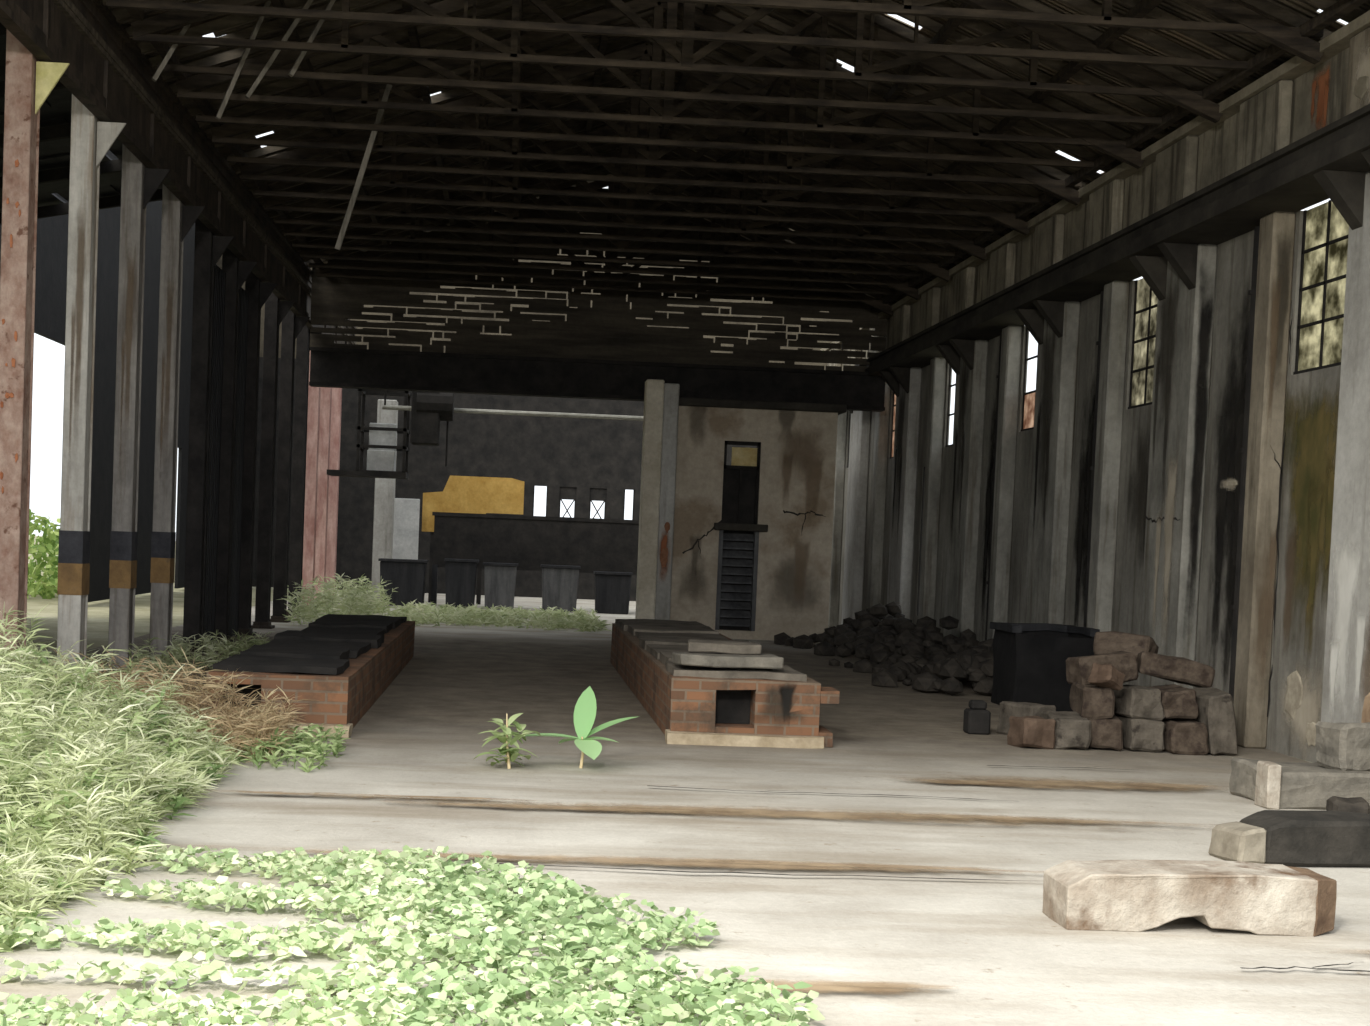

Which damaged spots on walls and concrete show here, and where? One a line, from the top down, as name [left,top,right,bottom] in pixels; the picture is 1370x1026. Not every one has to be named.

damp [1134,292,1177,623]
damp [1191,392,1245,634]
damp [1258,466,1370,704]